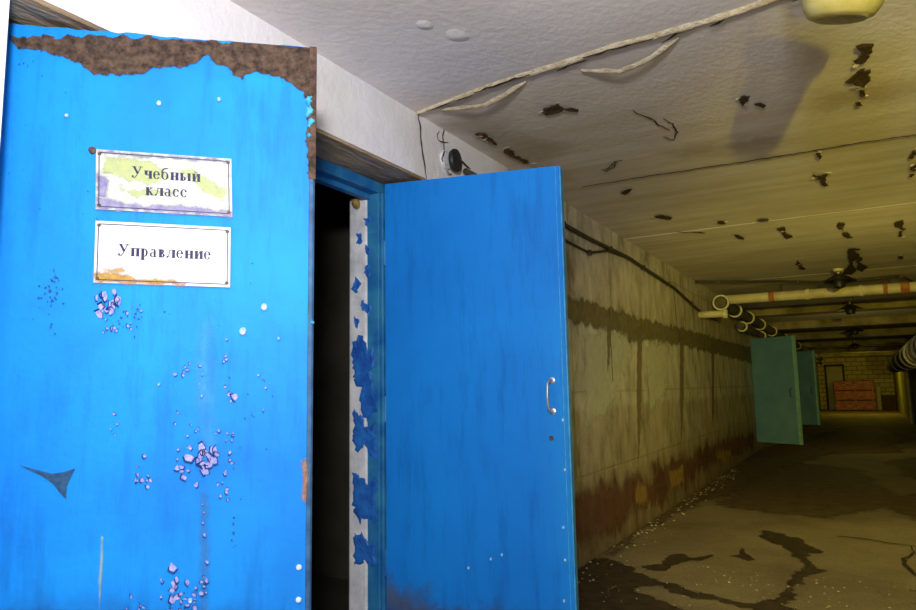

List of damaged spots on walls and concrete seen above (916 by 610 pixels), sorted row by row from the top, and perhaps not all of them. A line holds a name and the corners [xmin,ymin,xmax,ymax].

spalling [845,43,874,106]
corrosion [9,34,317,185]
spalling [538,102,579,116]
spalling [474,133,537,165]
spalling [812,172,832,187]
spalling [836,223,868,275]
peeling [351,217,379,459]
peeling [352,473,379,567]
leakage [577,429,916,610]
crack [837,536,916,604]